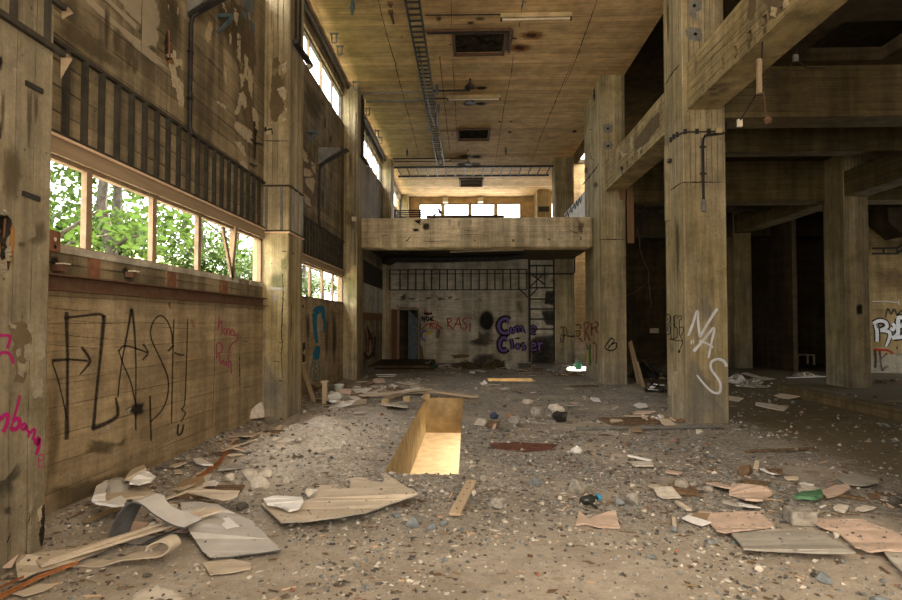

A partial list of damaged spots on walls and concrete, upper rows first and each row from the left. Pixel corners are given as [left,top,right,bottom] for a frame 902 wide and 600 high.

peeling [164,30,184,108]
peeling [216,0,287,170]
spalling [0,209,15,274]